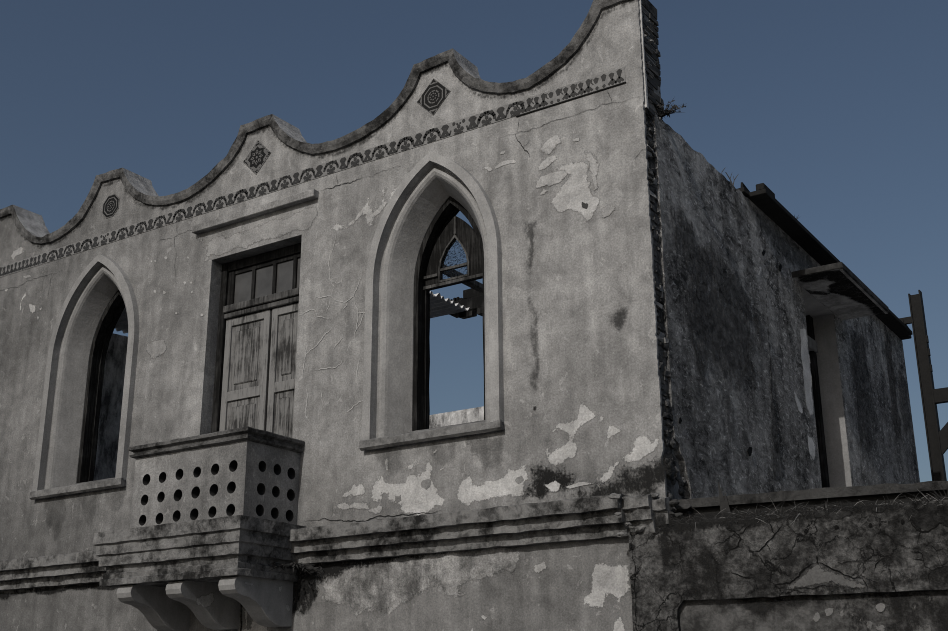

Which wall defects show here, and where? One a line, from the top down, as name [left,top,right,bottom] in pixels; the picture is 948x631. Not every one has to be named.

spalling [535,0,686,512]
peeling [337,449,445,515]
peeling [457,464,529,506]
damp [292,552,446,614]
peeling [583,563,631,631]
damp [741,595,821,616]
crack [727,520,948,591]
damp [829,535,948,631]